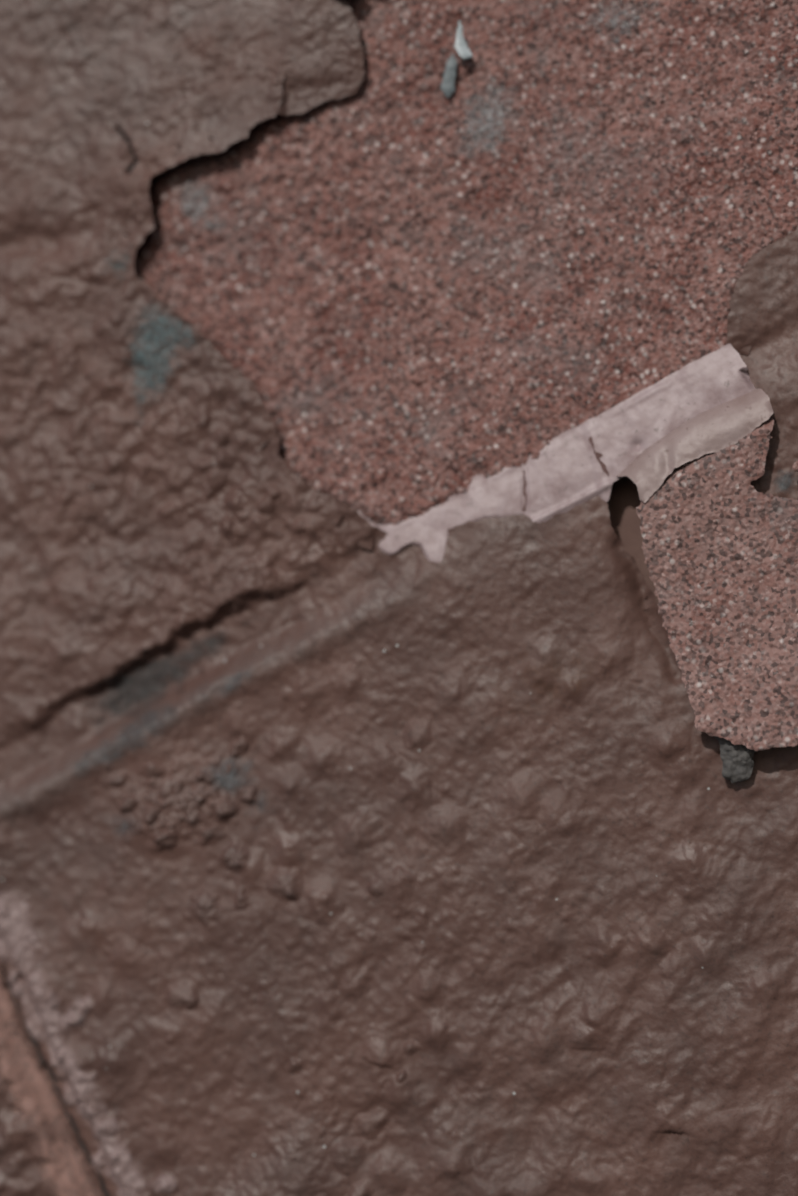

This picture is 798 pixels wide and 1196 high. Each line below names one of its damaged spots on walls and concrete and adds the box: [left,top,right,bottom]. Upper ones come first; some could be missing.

peeling [134,0,798,563]